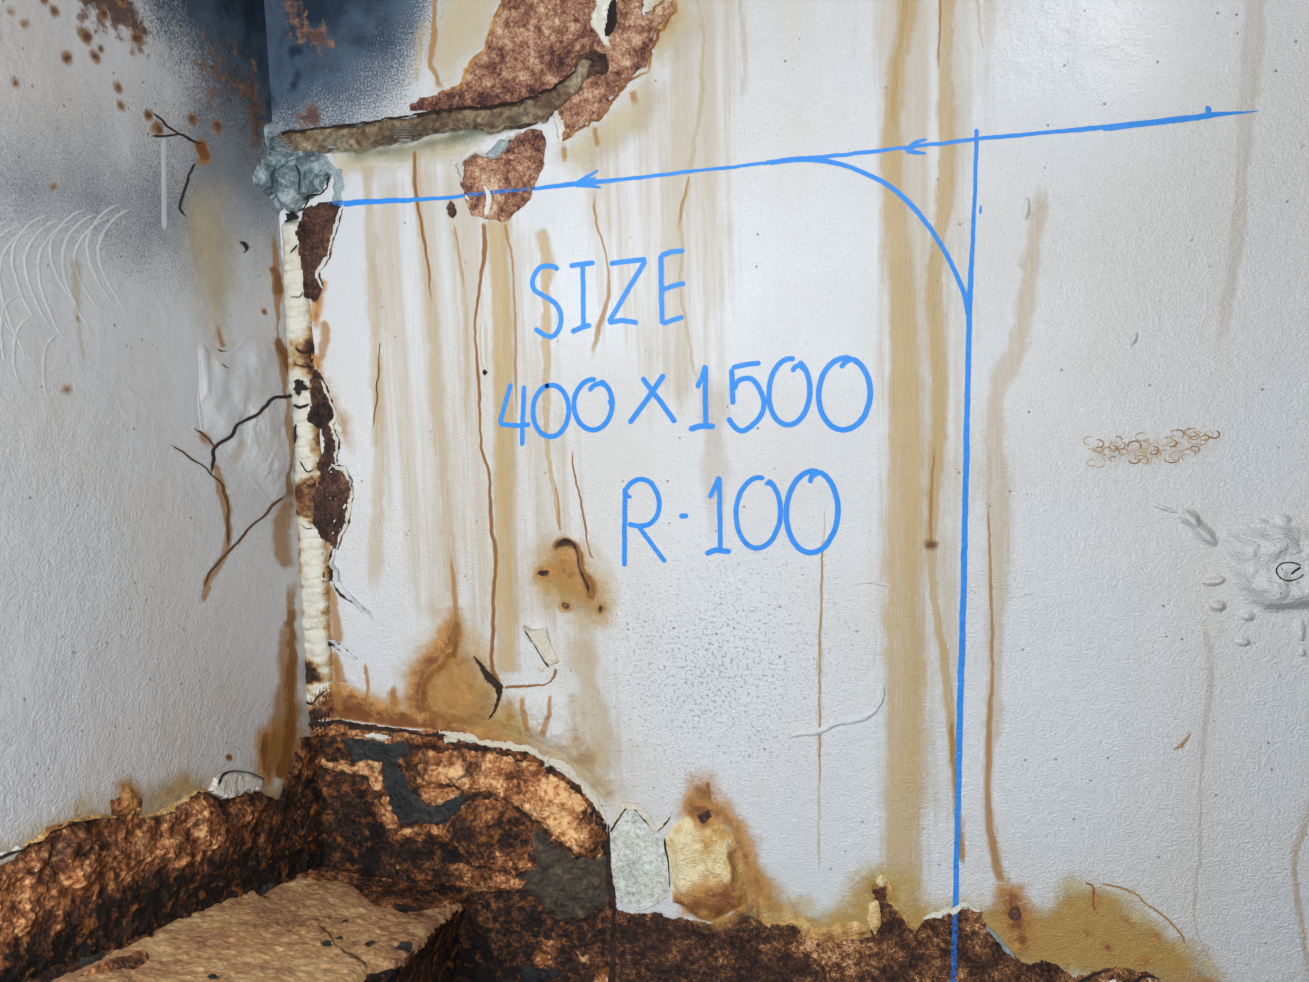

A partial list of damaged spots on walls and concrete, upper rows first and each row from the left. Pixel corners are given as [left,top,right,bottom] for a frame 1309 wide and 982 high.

corrosion [77,0,152,63]
damp [428,0,493,86]
corrosion [410,0,678,144]
damp [652,0,690,49]
peeling [264,122,297,165]
peeling [446,201,457,219]
crack [172,347,316,599]
corrosion [0,109,1159,982]
peeling [208,754,265,799]
peeling [609,802,671,912]
damp [790,873,965,940]
damp [982,882,1217,982]